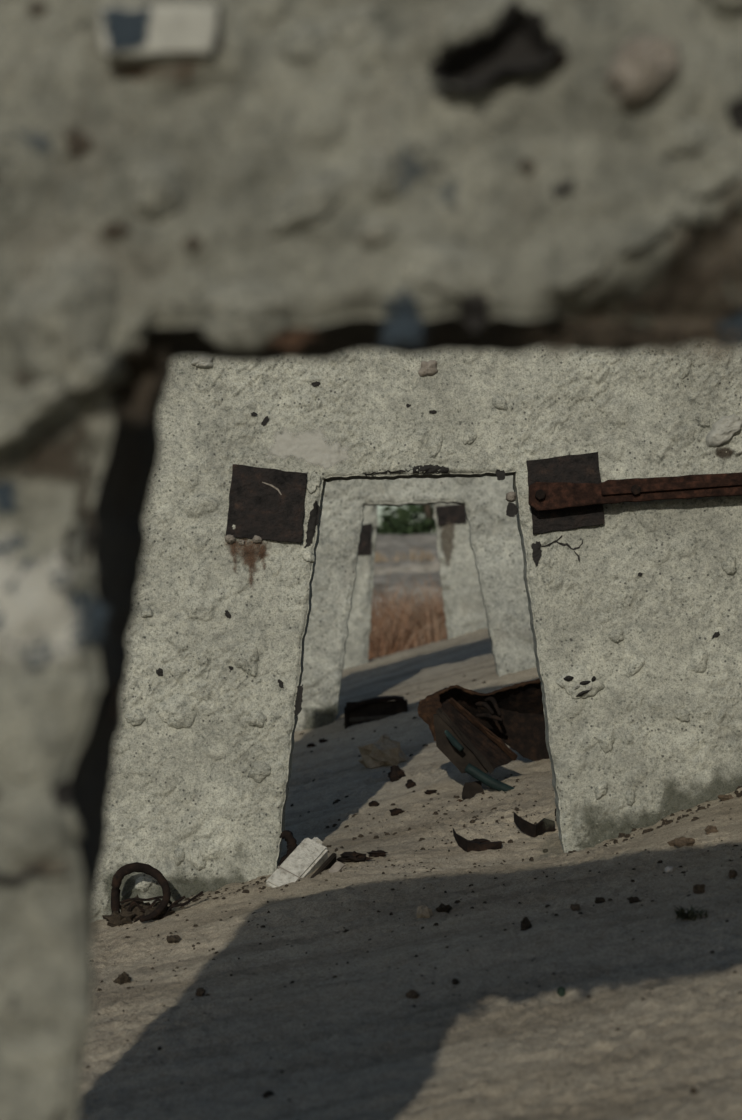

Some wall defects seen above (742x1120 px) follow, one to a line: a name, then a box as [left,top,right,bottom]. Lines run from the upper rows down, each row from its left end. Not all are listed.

rust [231,538,266,584]
crack [541,535,583,562]